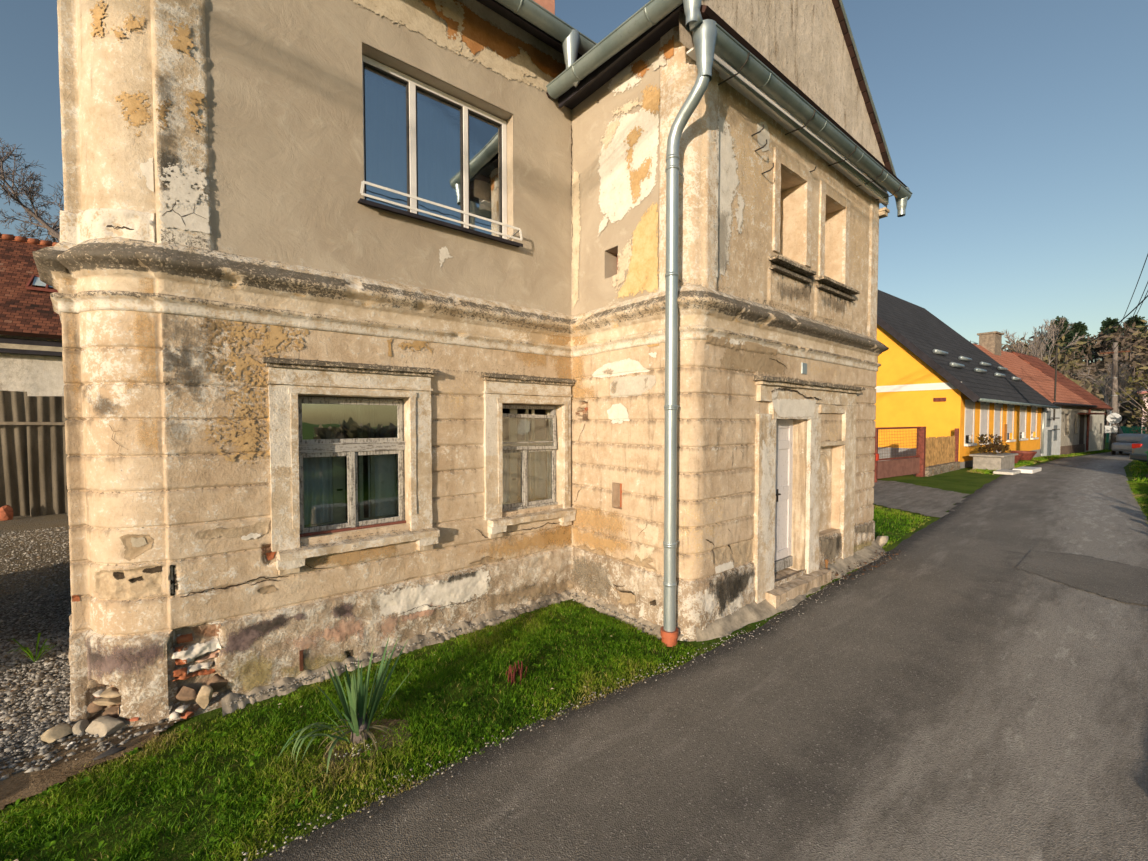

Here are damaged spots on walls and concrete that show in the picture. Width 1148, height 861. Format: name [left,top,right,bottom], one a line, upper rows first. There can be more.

peeling [167,21,200,61]
peeling [353,0,566,92]
peeling [115,85,209,137]
peeling [140,157,212,234]
peeling [597,35,674,298]
peeling [198,317,309,468]
peeling [592,352,657,424]
spalling [94,534,178,601]
spalling [470,556,504,565]
water stain [710,567,756,615]
flaking render [169,623,231,719]
flaking render [87,687,139,730]